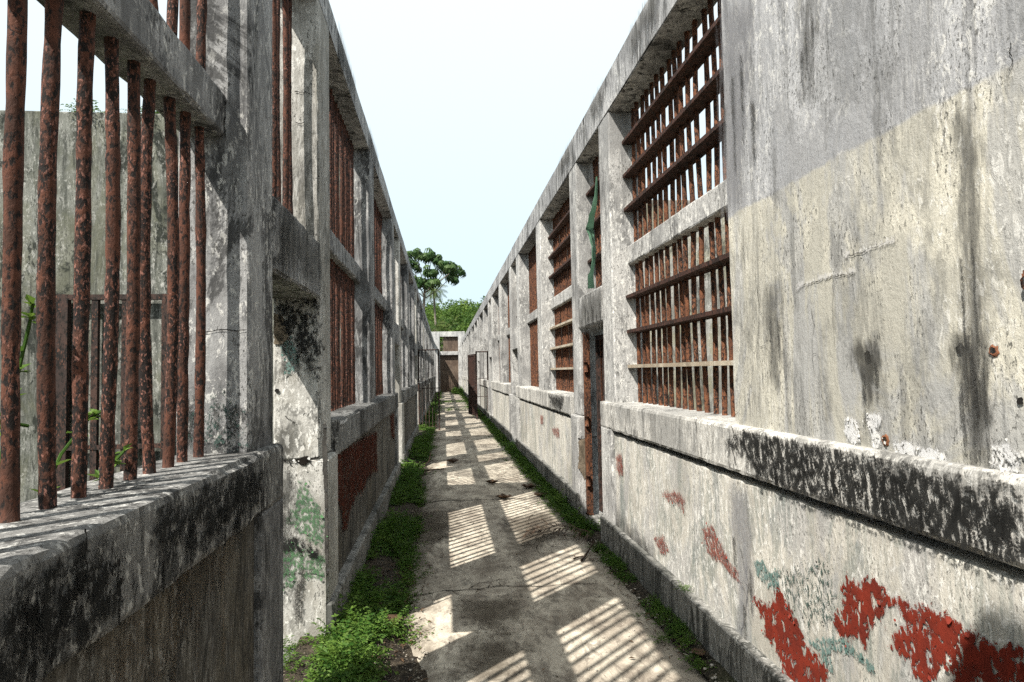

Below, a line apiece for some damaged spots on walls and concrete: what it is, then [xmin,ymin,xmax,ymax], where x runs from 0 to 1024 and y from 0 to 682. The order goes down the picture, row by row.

leakage [272,214,325,390]
crack [797,235,894,370]
leakage [724,120,1024,565]
mould [0,526,136,682]
mould [141,467,266,593]
peeling [283,423,378,591]
peeling [662,488,684,514]
peeling [702,522,741,583]
peeling [752,553,1024,682]
flaking render [844,412,947,461]